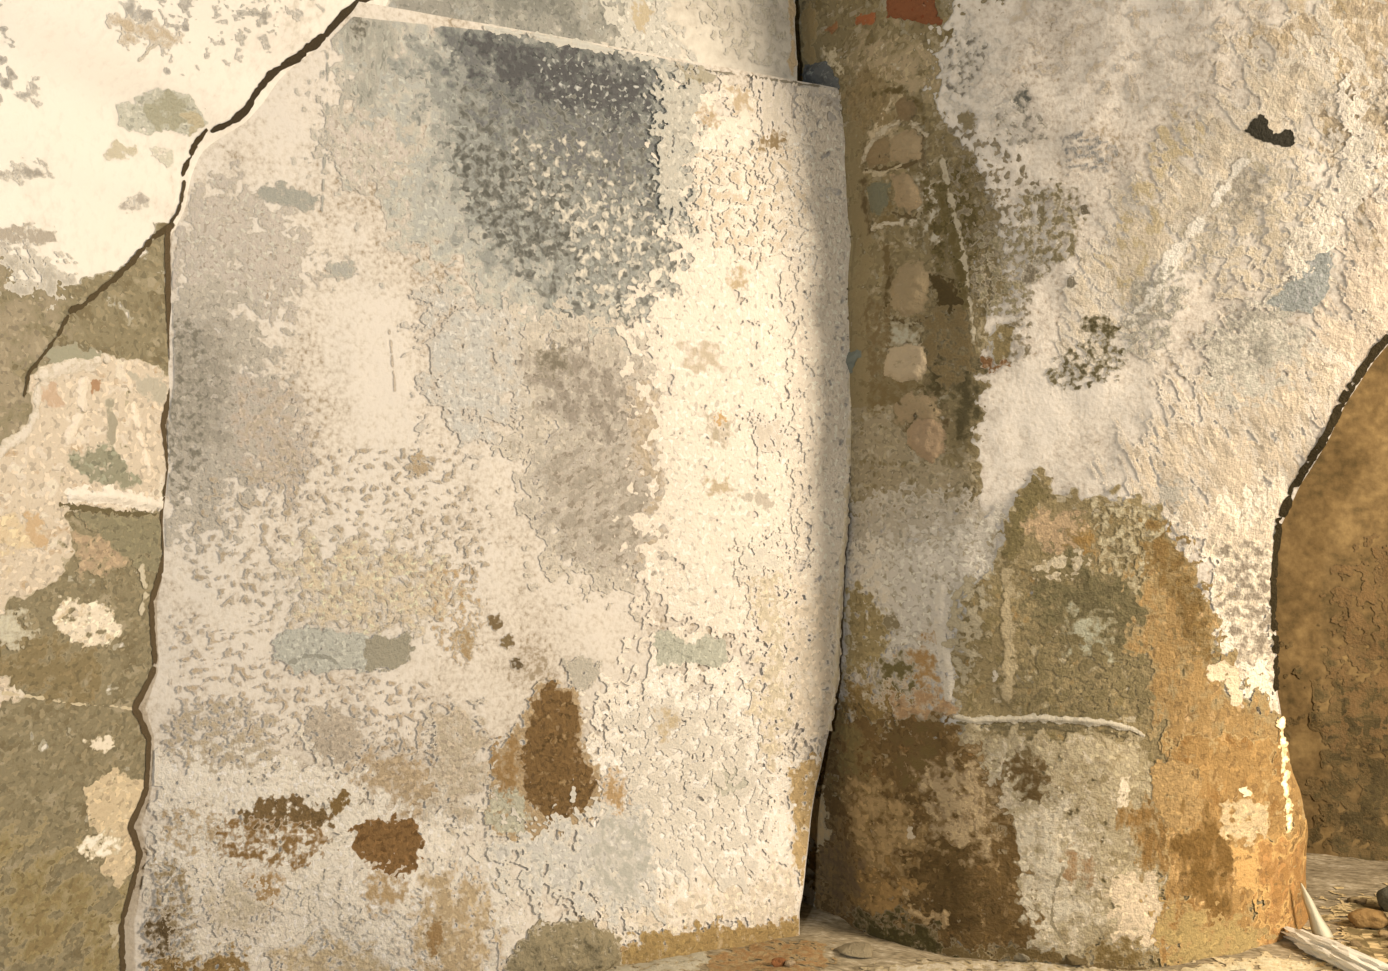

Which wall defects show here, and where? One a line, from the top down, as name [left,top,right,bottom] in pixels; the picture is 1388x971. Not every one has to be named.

flaking render [104,87,208,170]
water stain [600,0,698,62]
crack [1,0,370,971]
crack [388,329,396,392]
corrosion [164,438,634,842]
peeling [509,0,1029,693]
water stain [1114,775,1141,814]
crack [1269,334,1388,692]